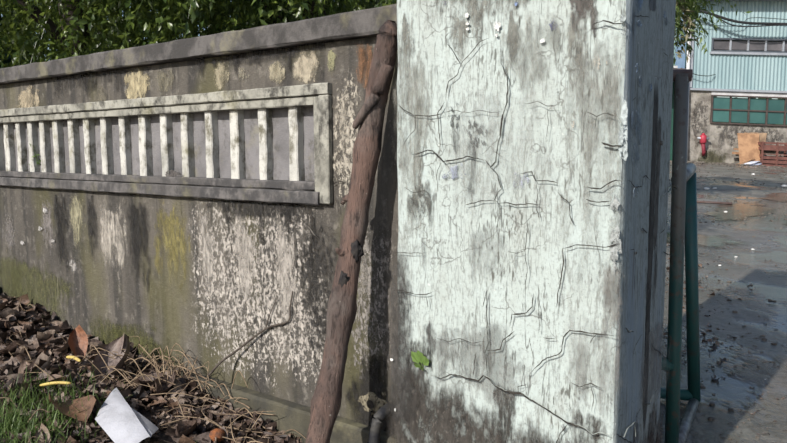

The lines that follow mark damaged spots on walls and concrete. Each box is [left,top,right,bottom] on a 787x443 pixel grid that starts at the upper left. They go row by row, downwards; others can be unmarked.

leakage [568,0,597,80]
leakage [42,195,176,291]
leakage [206,199,336,363]
leakage [346,260,558,443]
crack [397,34,664,443]
leakage [575,413,601,443]